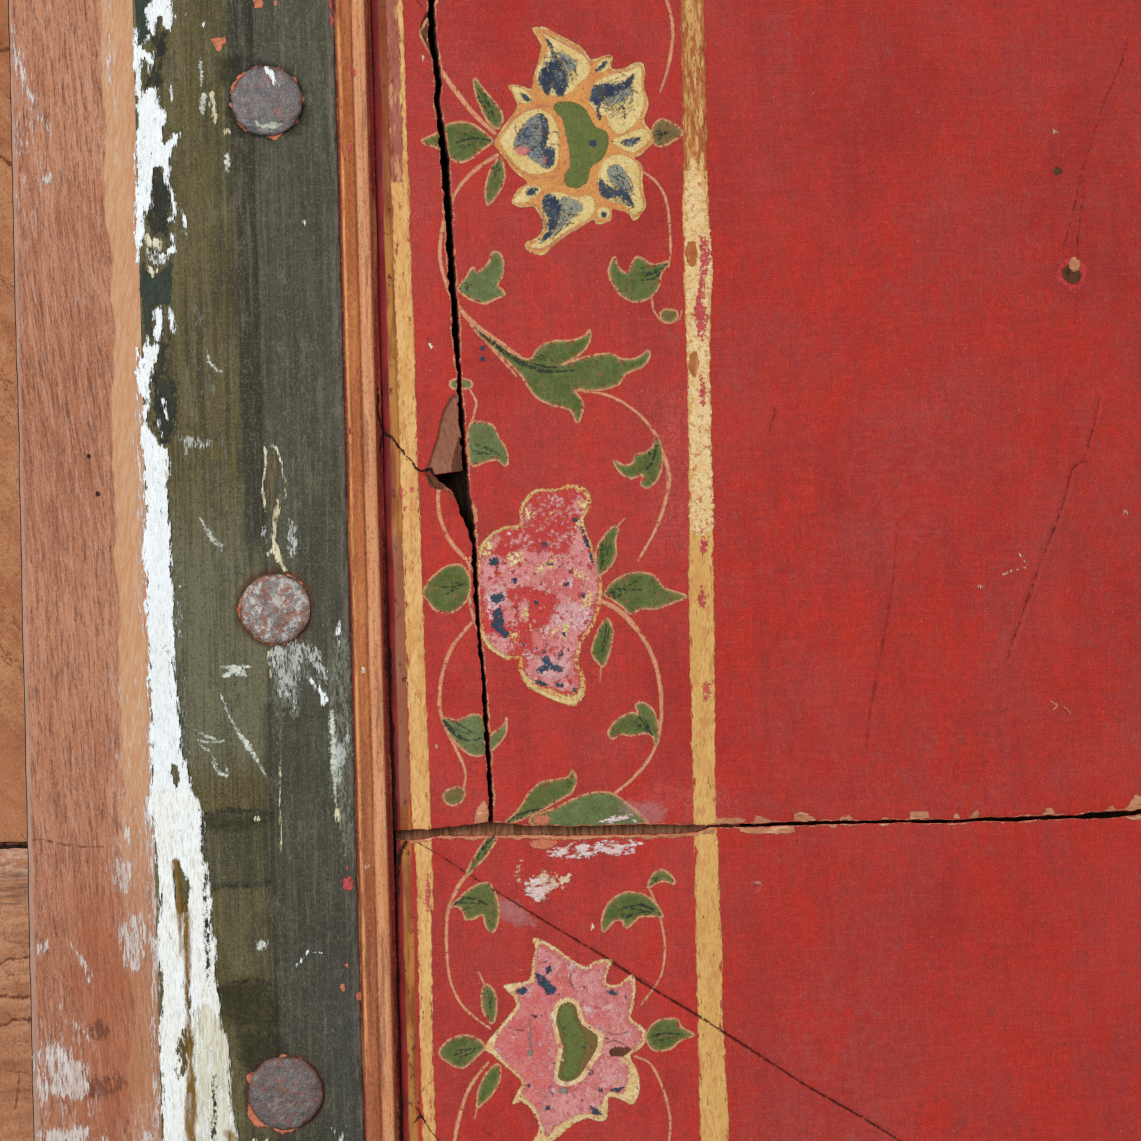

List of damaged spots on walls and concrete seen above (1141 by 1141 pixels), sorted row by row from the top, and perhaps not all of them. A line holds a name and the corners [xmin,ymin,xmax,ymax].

peeling [11,24,52,133]
peeling [106,0,238,1141]
crack [376,0,1141,1141]
peeling [33,1040,91,1107]
peeling [36,1124,109,1141]
rust [247,1105,296,1134]